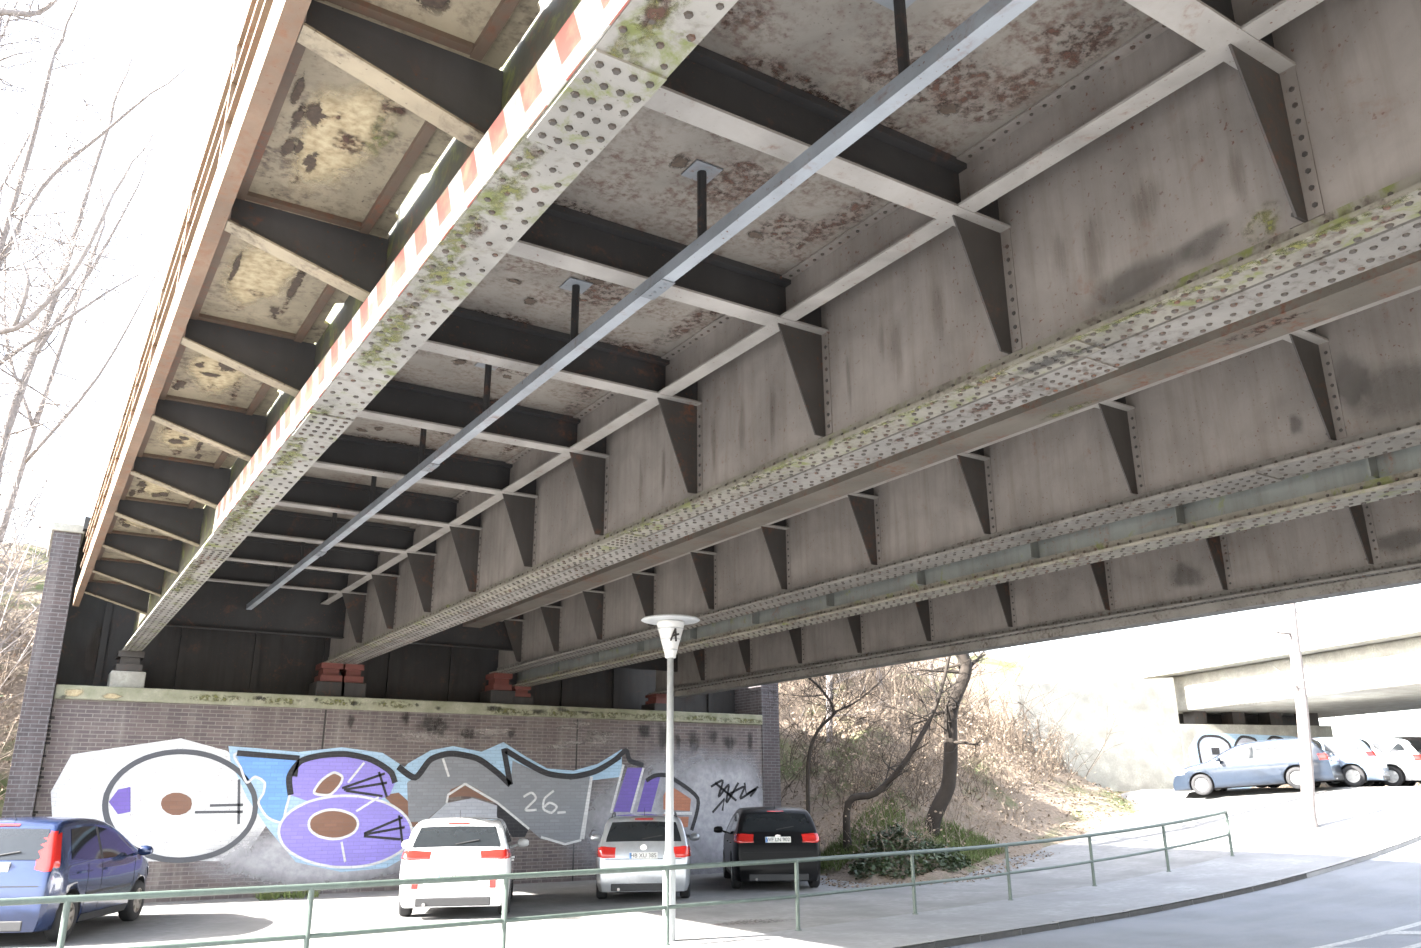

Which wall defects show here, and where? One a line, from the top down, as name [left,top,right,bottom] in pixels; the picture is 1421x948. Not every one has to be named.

corrosion [736,57,855,109]
corrosion [866,46,927,83]
corrosion [910,18,1113,121]
corrosion [669,155,690,169]
corrosion [707,162,773,201]
corrosion [748,193,875,249]